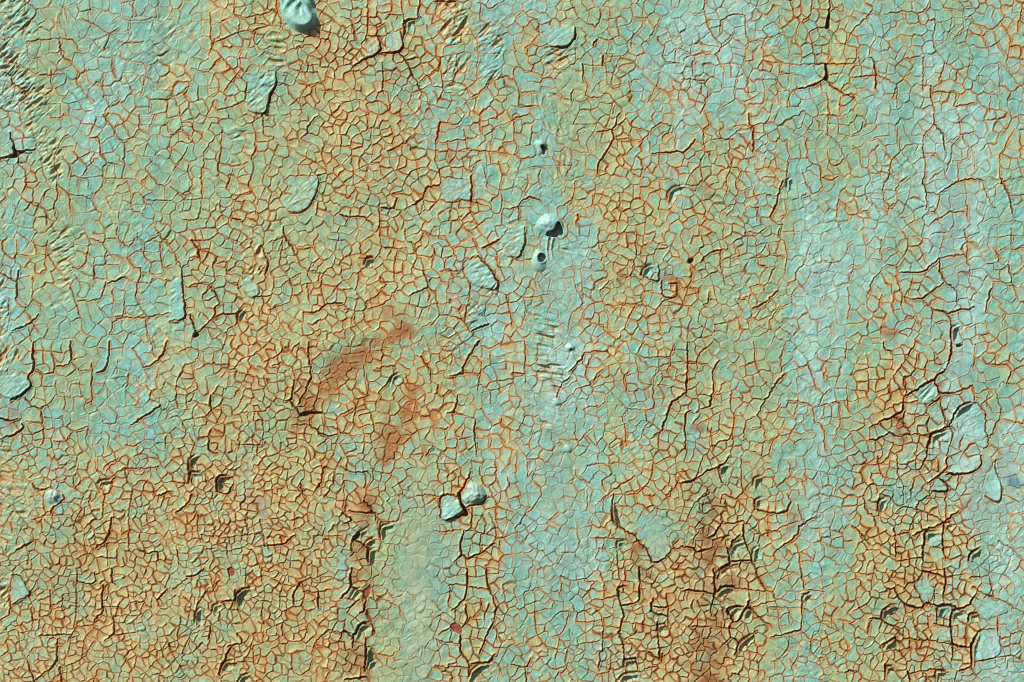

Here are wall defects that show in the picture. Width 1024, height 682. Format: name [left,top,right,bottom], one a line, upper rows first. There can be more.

crack [0,0,611,682]
corrosion [304,326,411,423]
crack [418,0,1024,682]
peeling [917,382,939,404]
peeling [931,403,1002,502]
peeling [353,524,395,563]
peeling [355,623,378,671]